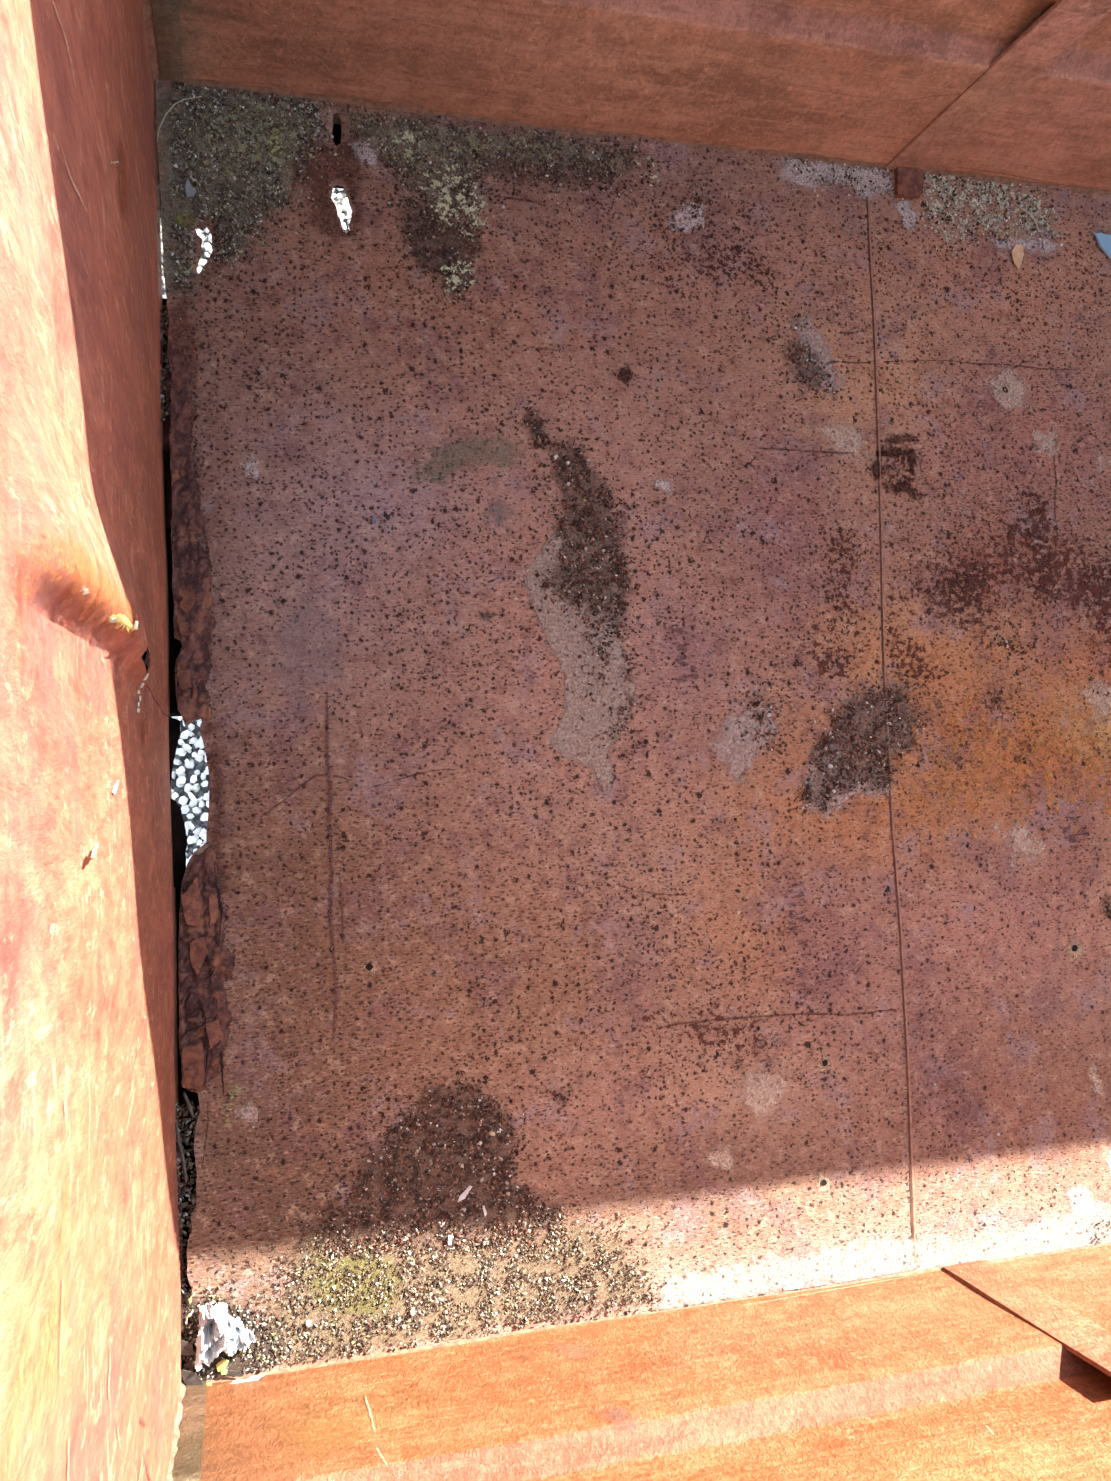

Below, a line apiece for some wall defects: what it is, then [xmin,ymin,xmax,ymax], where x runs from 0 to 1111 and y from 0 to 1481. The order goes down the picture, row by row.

damp [351,140,377,168]
damp [989,238,1057,255]
peeling [177,585,195,636]
corrosion [792,434,1111,917]
peeling [181,878,219,974]
peeling [181,1020,224,1090]